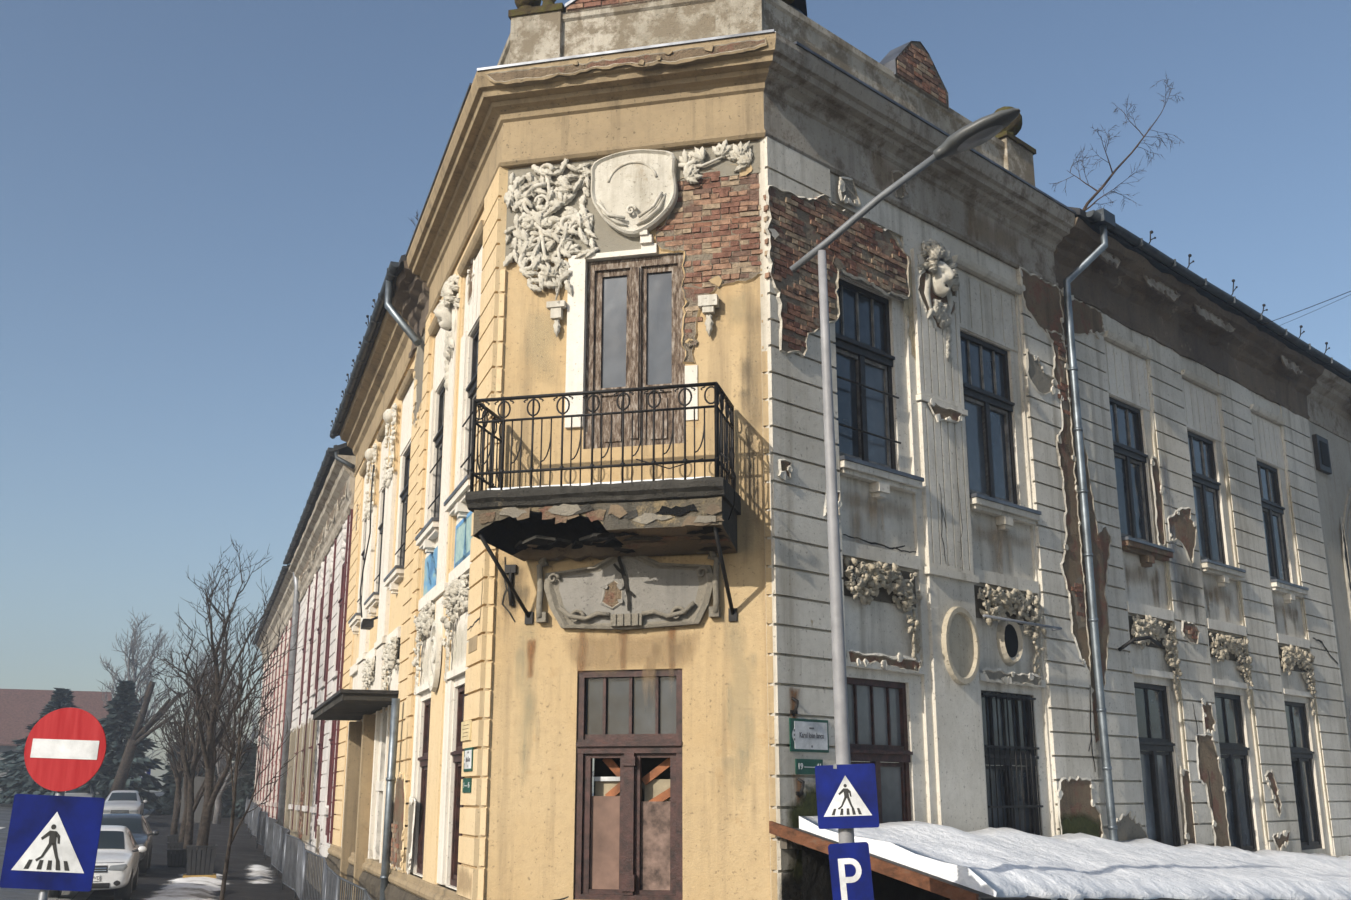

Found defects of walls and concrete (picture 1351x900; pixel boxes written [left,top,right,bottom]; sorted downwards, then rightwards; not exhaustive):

flaking render [654,164,957,364]
spalling [479,504,732,553]
flaking render [1019,266,1112,755]
flaking render [1150,429,1231,847]